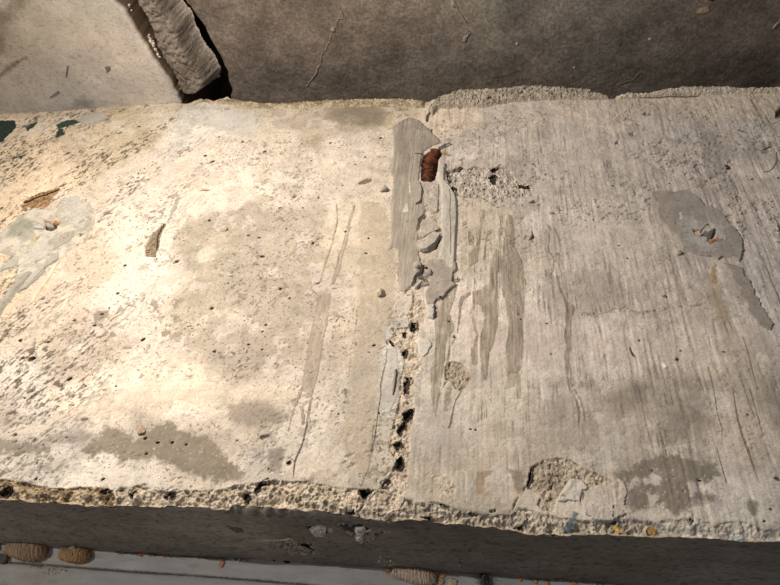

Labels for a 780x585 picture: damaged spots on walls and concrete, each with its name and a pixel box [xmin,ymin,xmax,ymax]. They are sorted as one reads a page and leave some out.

spalling [195,85,780,117]
rust [414,138,451,182]
spalling [410,166,534,252]
leakage [81,420,245,480]
spalling [392,408,415,471]
spalling [0,458,780,545]
leakage [615,455,719,514]